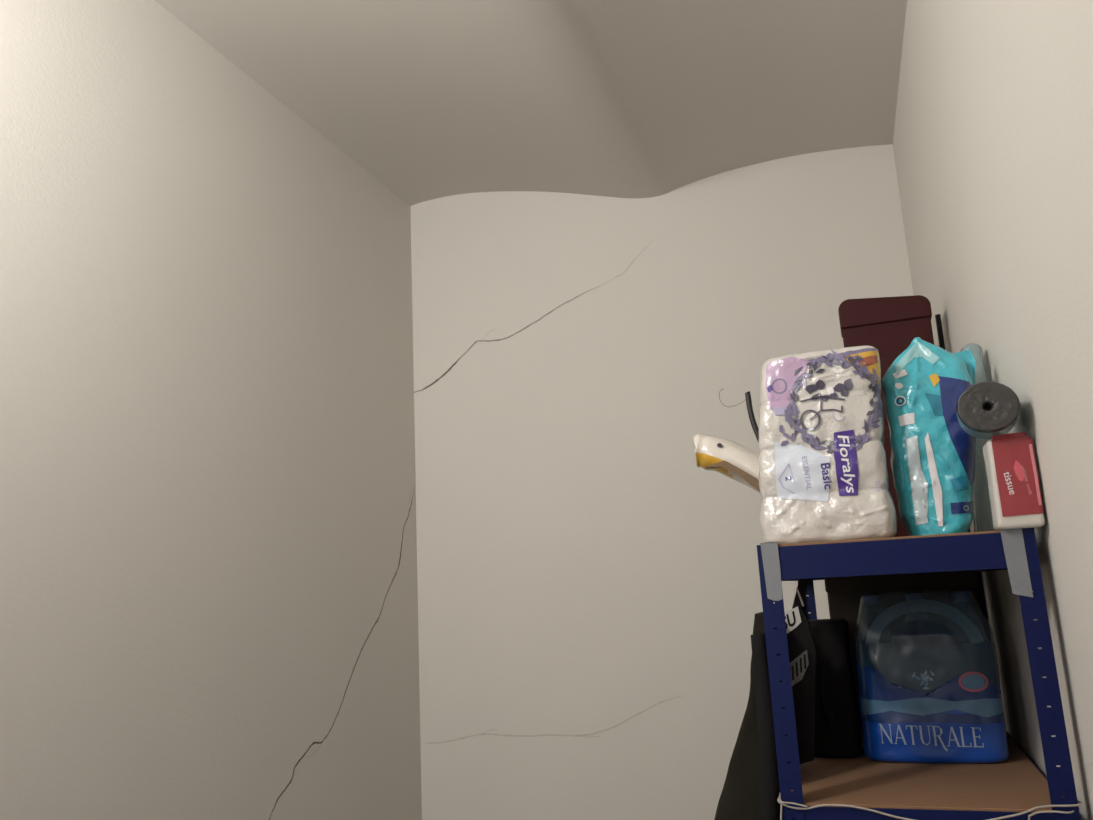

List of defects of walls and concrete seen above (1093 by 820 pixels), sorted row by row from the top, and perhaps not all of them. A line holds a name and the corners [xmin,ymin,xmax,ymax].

crack [269,502,412,820]